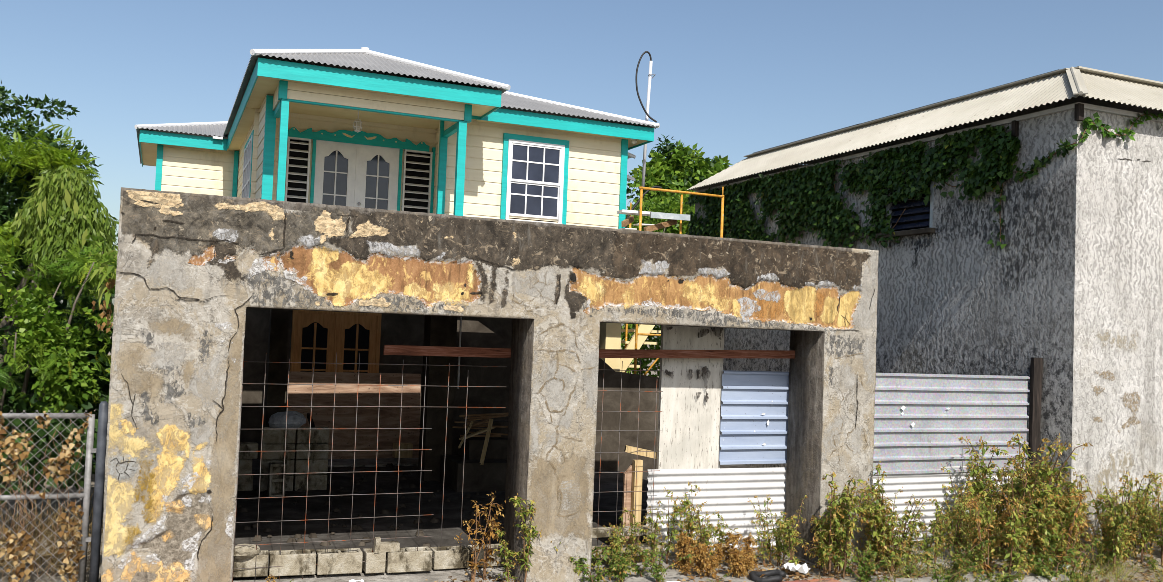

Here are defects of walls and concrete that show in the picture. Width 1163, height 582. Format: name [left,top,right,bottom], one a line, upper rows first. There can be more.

peeling [126,190,184,216]
crack [121,200,287,255]
flaking render [188,229,238,266]
flaking render [215,201,482,312]
flaking render [569,261,862,330]
crack [117,271,253,441]
flaking render [101,352,506,582]
crack [197,490,213,560]